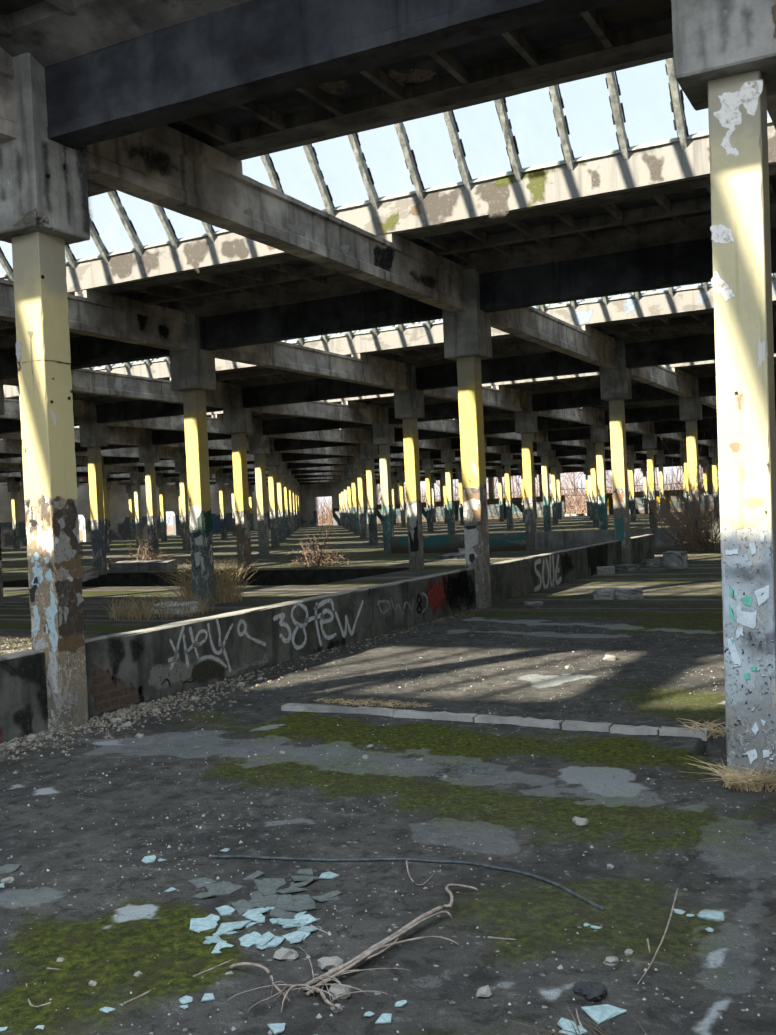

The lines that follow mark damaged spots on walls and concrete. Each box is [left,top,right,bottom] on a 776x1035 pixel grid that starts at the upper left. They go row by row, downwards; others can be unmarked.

peeling [713,80,763,156]
damp [129,146,177,175]
peeling [710,224,734,244]
peeling [712,271,735,301]
peeling [3,499,409,714]